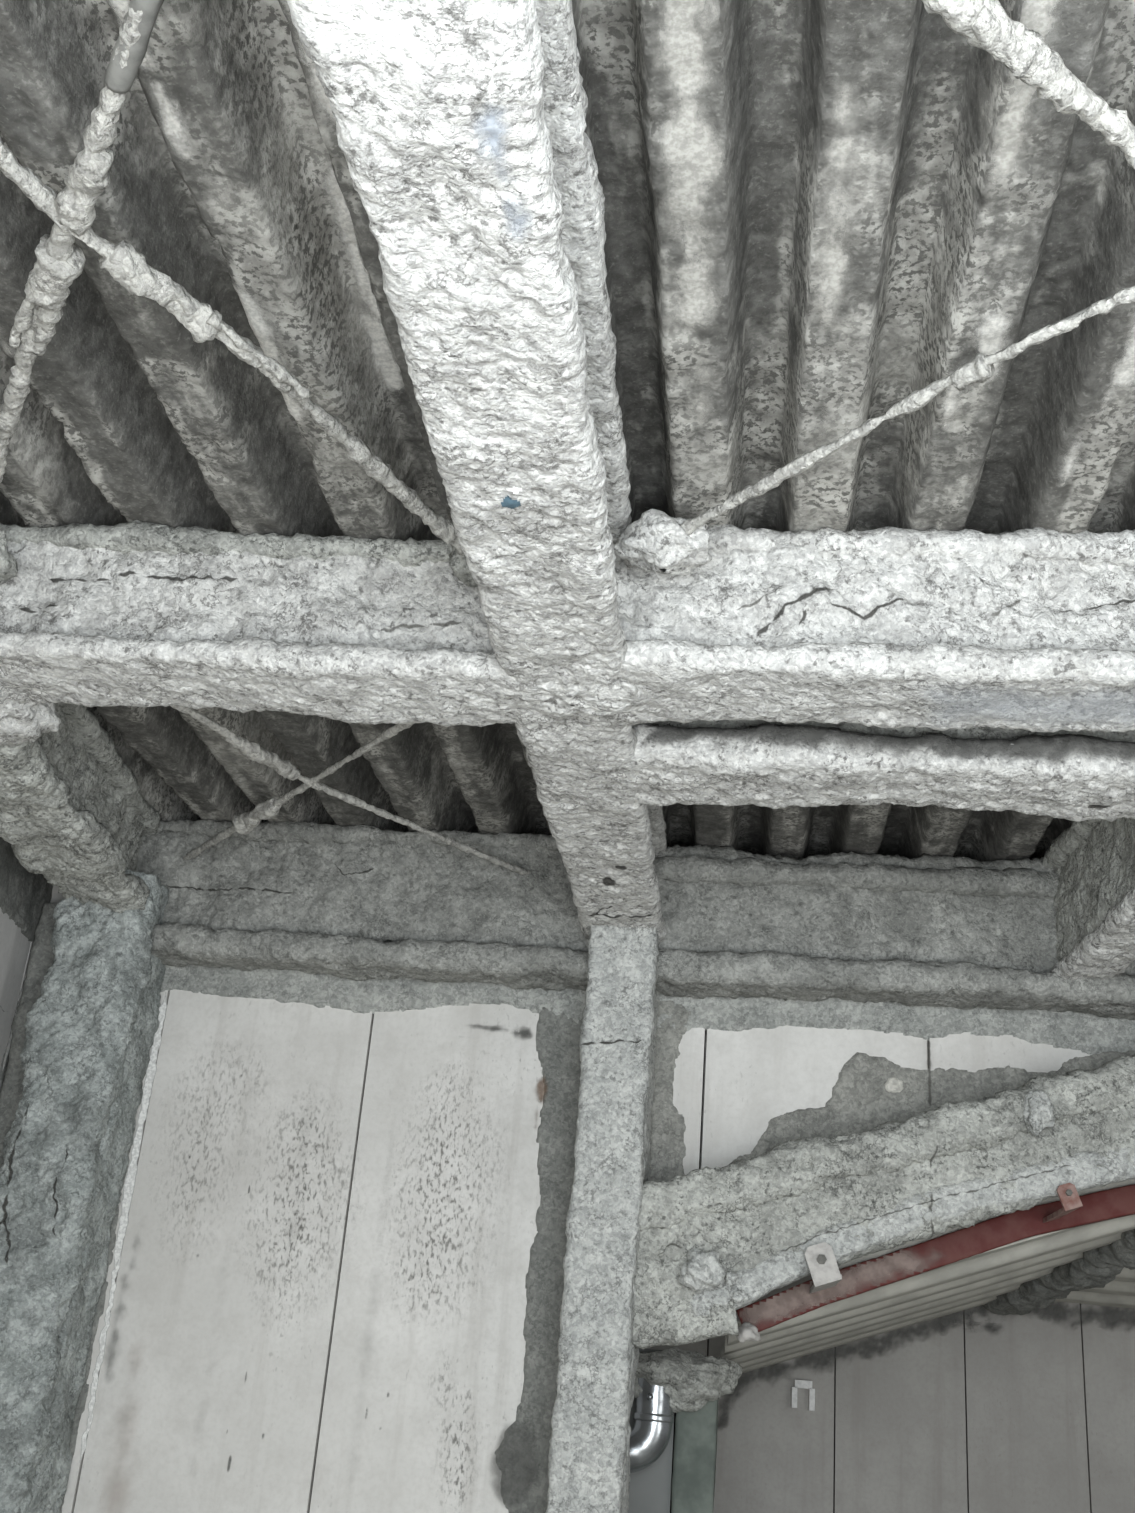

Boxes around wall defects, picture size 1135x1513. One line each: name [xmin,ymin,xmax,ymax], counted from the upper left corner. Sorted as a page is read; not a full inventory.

crack [739,587,904,635]
crack [0,1104,29,1263]
crack [52,1149,68,1235]
damp [282,1143,322,1266]
damp [419,1120,465,1277]
damp [495,1429,533,1498]